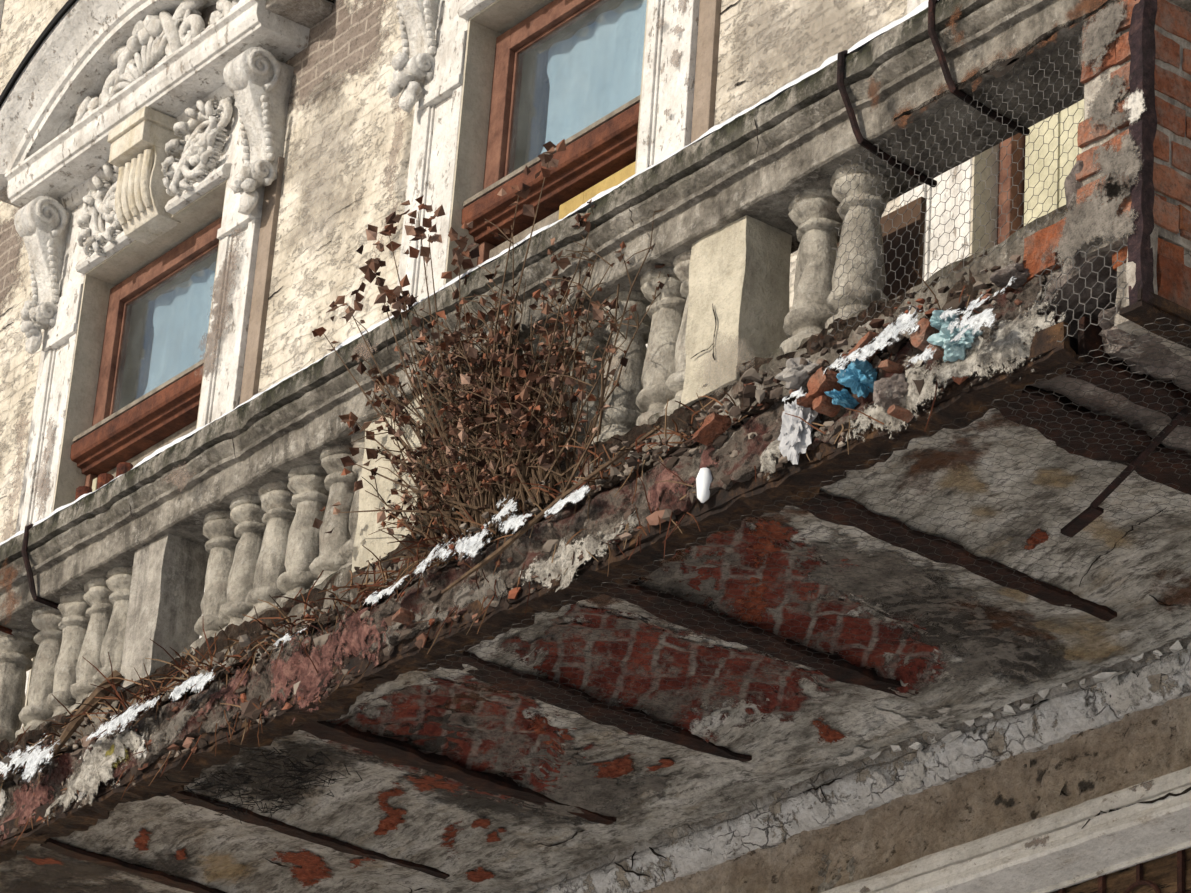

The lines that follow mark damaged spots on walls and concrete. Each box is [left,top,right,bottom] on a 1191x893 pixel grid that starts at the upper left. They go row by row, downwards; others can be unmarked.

spalling [760,438,781,480]
spalling [520,442,721,595]
corrosion [1152,569,1191,612]
spalling [261,570,507,725]
spalling [490,517,1191,795]
spalling [0,661,249,841]
spalling [304,675,675,836]
crack [800,778,842,800]
crack [1081,787,1191,829]
crack [538,830,584,847]
spalling [272,848,333,888]
crack [614,847,667,877]